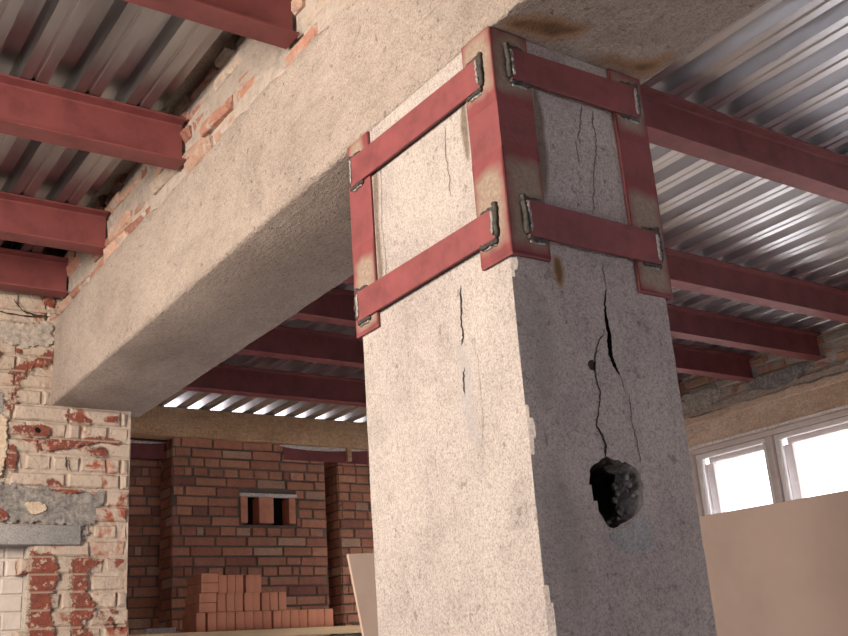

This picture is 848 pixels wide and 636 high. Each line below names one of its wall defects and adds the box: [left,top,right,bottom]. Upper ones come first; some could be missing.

corrosion [491,0,696,85]
crack [575,106,597,215]
corrosion [548,249,569,293]
crack [458,287,466,345]
crack [588,266,641,463]
peeling [0,348,120,475]
flaking render [24,501,47,515]
peeling [46,478,82,495]
spalling [589,457,644,528]
peeling [26,549,98,636]